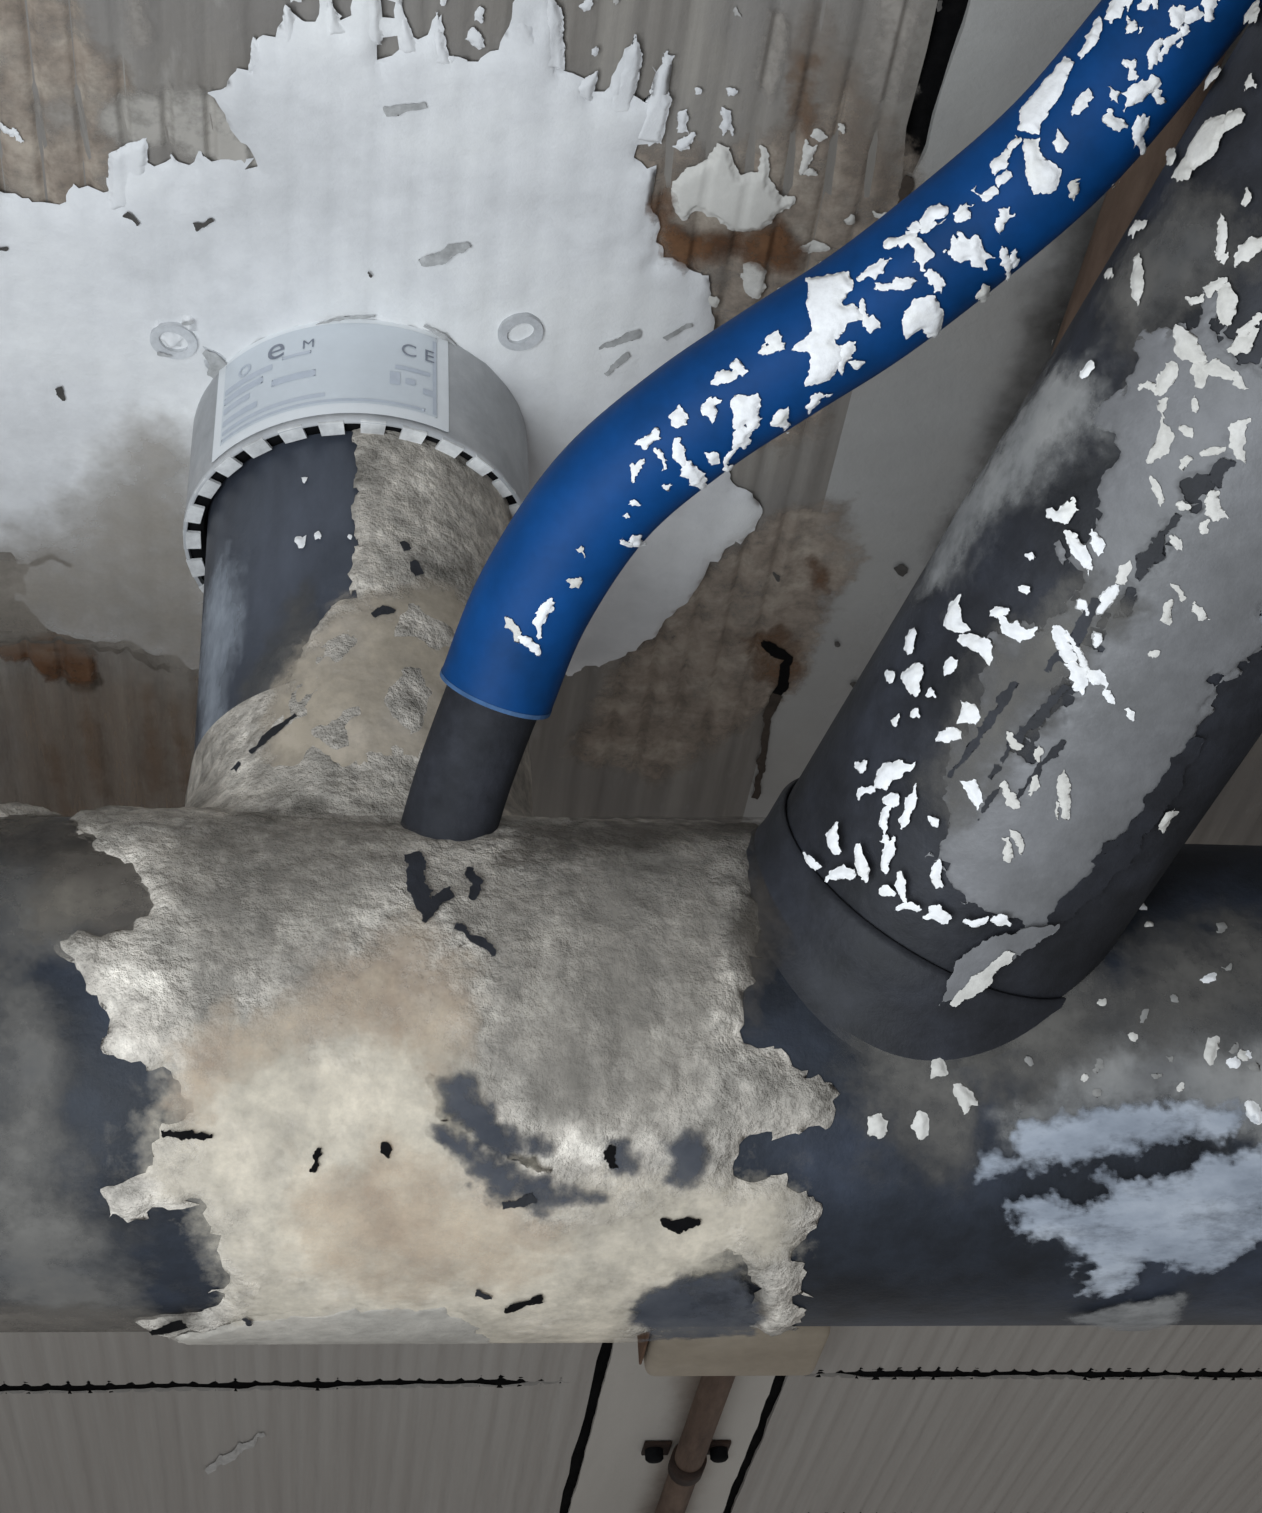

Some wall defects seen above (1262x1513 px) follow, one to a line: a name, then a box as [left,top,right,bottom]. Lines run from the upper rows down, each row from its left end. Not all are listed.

leakage [0,0,132,205]
spalling [383,102,427,117]
crack [897,0,968,204]
spalling [193,218,214,231]
corrosion [649,195,803,272]
spalling [418,242,471,267]
spalling [202,350,227,379]
spalling [599,330,642,376]
peeling [400,541,424,576]
peeling [371,605,396,618]
corrosion [0,631,97,684]
crack [0,636,171,673]